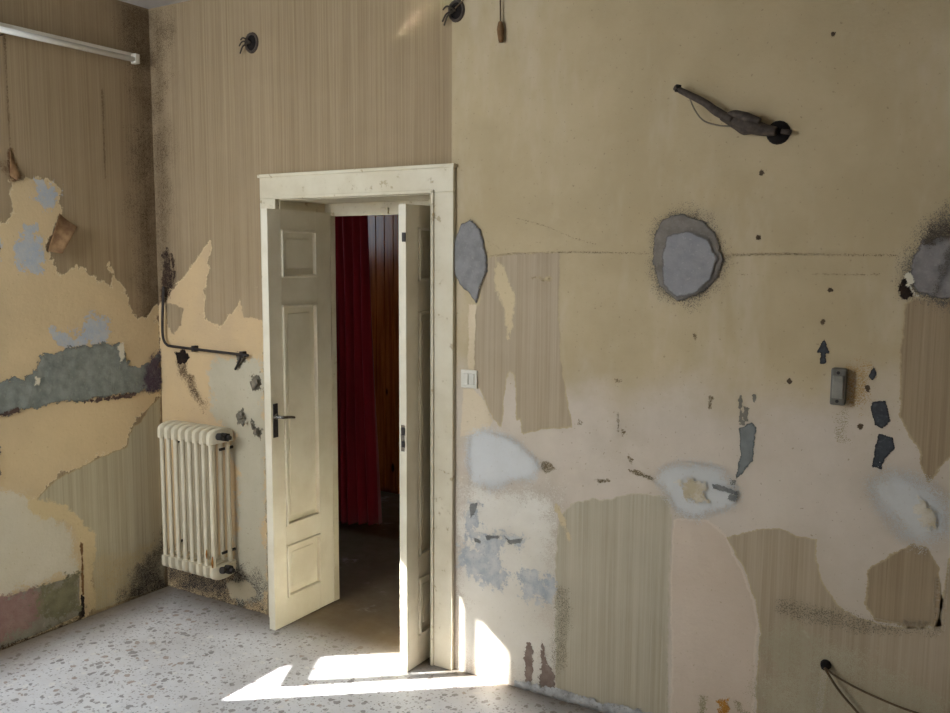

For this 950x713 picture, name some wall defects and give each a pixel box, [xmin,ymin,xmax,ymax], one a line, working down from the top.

peeling [0,148,268,650]
spalling [712,394,756,502]
peeling [817,340,829,364]
peeling [871,401,895,470]
peeling [455,465,651,713]
peeling [669,518,758,713]